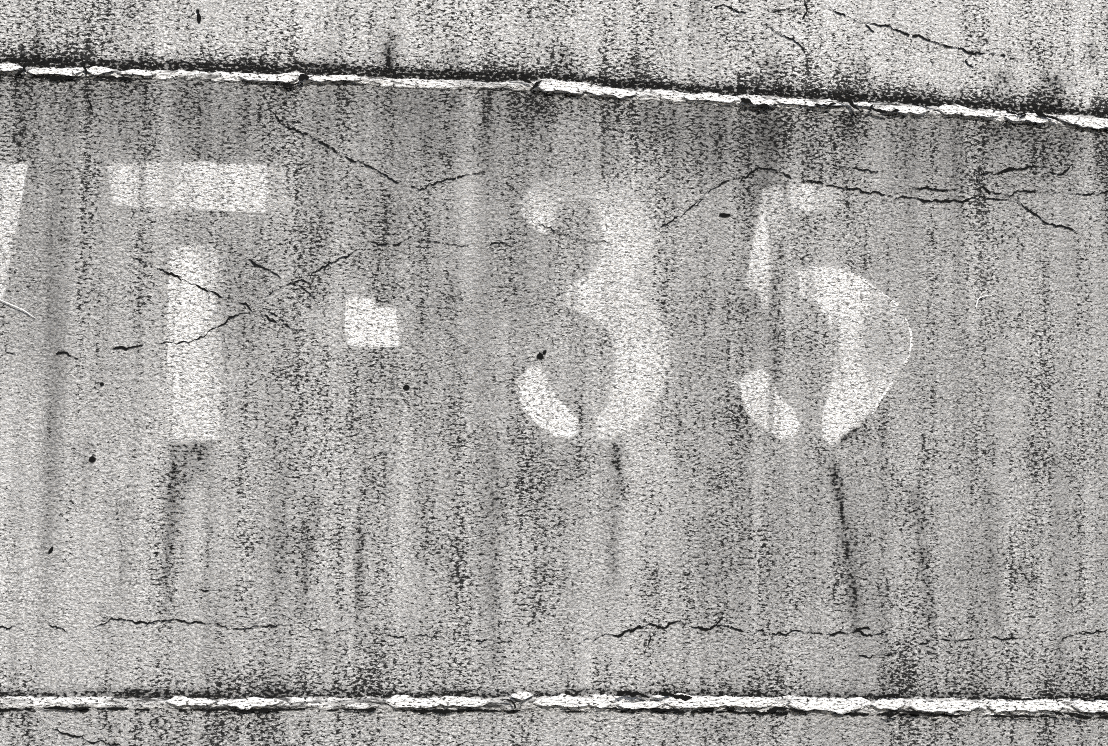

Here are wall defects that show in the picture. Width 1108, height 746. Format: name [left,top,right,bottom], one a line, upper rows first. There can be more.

crack [673,4,746,13]
crack [769,0,1022,70]
damp [1039,73,1069,110]
crack [270,112,485,190]
crack [658,163,1108,232]
crack [112,218,630,350]
damp [164,442,208,550]
damp [611,443,624,490]
damp [482,452,506,662]
damp [828,454,858,630]
damp [911,487,934,641]
crack [583,619,1026,658]